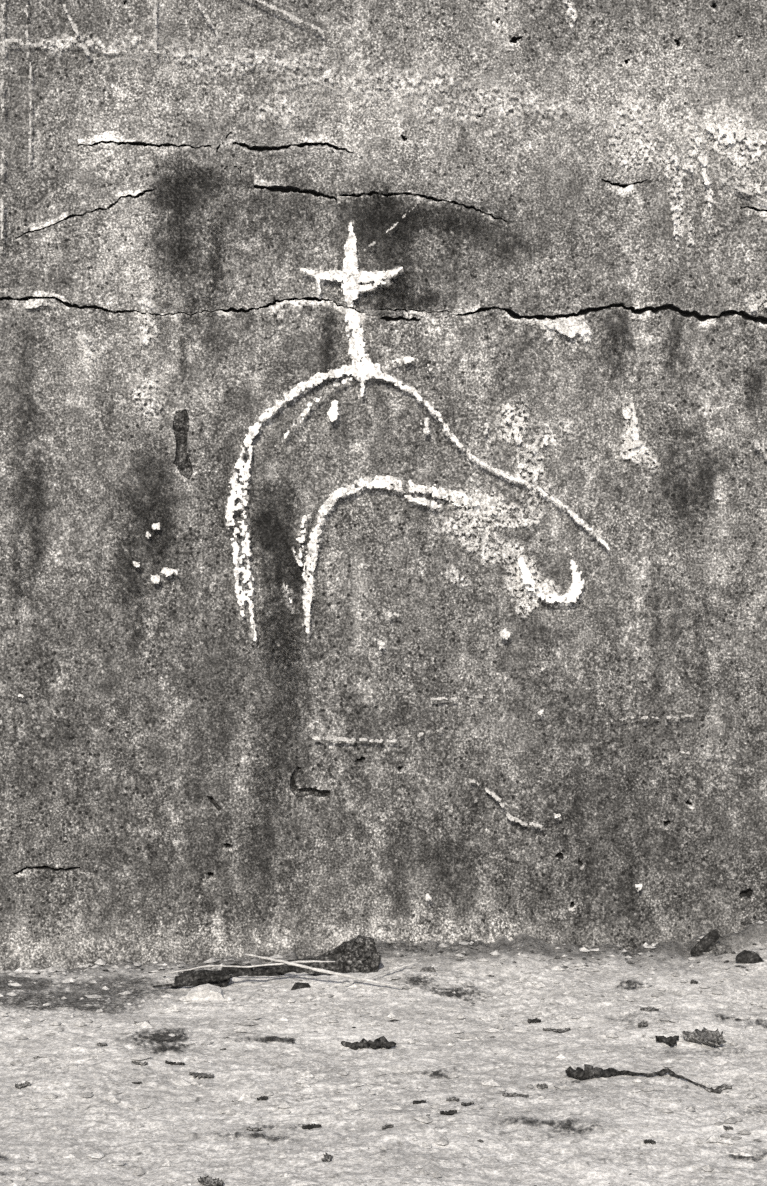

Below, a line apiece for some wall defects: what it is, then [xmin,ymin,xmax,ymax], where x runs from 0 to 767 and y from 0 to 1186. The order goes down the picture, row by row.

crack [13,128,509,245]
crack [599,174,649,198]
crack [740,200,767,218]
leakage [150,164,235,378]
leakage [133,292,166,349]
crack [0,289,767,329]
leakage [80,334,108,363]
leakage [129,367,165,418]
leakage [113,449,176,609]
leakage [251,483,309,775]
crack [14,860,80,880]